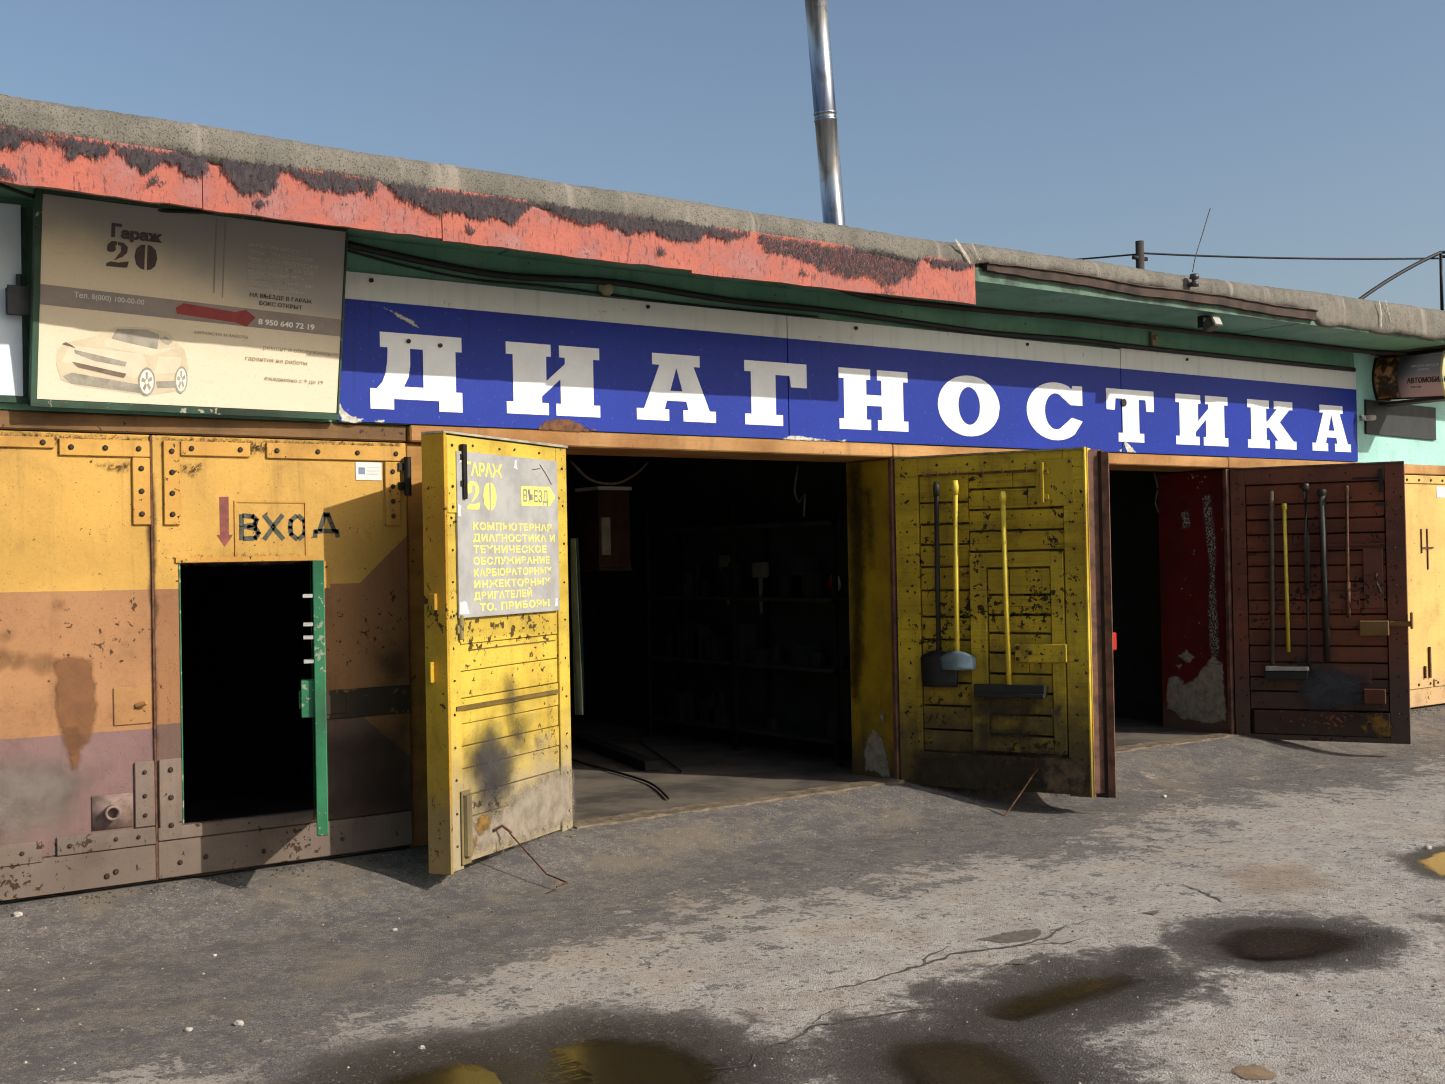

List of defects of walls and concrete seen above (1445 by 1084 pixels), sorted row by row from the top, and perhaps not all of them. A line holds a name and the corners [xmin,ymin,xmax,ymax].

peeling [0,120,975,296]
flaking render [1166,495,1227,725]
crack [705,920,1087,1071]